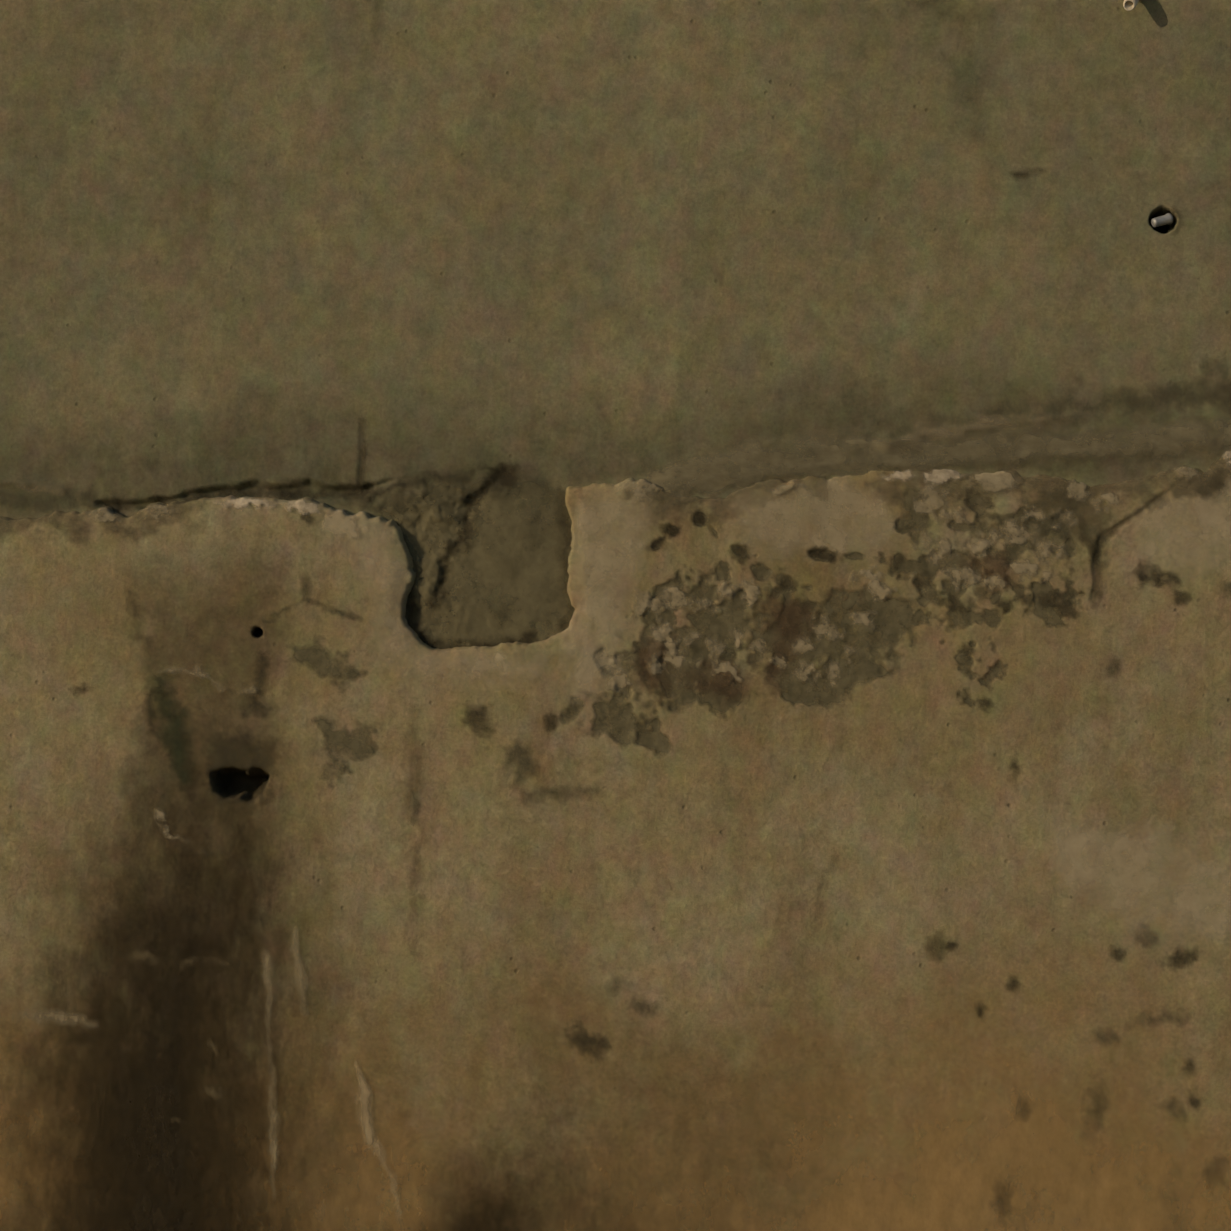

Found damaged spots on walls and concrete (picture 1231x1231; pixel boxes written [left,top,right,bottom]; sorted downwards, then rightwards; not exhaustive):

crack [105,446,441,511]
spalling [374,465,572,649]
peeling [544,469,1120,754]
peeling [293,646,366,679]
peeling [312,718,376,774]
water stain [1171,950,1196,965]
water stain [80,810,283,1231]